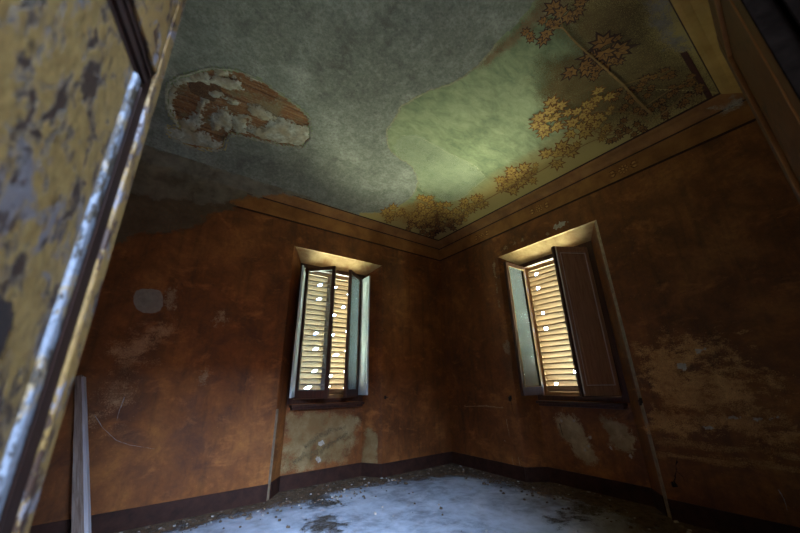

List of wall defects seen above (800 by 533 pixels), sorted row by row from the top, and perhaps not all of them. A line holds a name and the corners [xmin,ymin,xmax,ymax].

peeling [113,0,535,252]
peeling [280,410,378,475]
peeling [553,410,637,467]